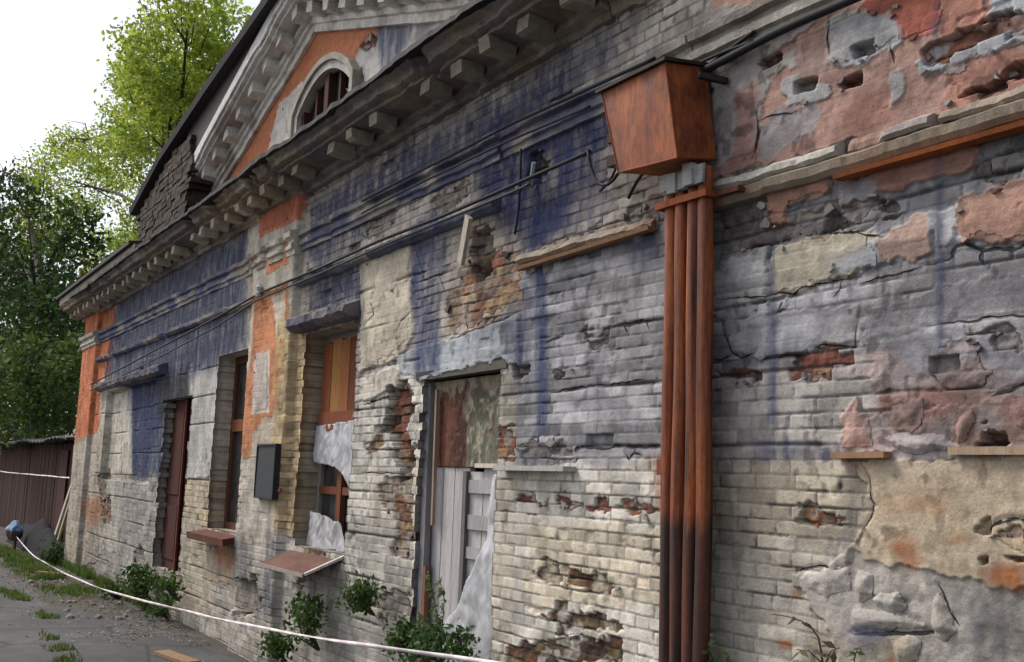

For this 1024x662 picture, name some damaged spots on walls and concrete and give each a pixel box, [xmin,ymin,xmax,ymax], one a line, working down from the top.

flaking render [828,0,943,68]
spalling [916,14,1024,80]
flaking render [782,82,844,106]
crack [756,214,881,247]
spalling [444,230,601,328]
crack [713,242,1024,361]
spalling [365,381,416,559]
spalling [983,428,1011,447]
spalling [517,495,658,520]
crack [795,462,875,571]
spalling [534,558,621,595]
spalling [507,601,623,662]